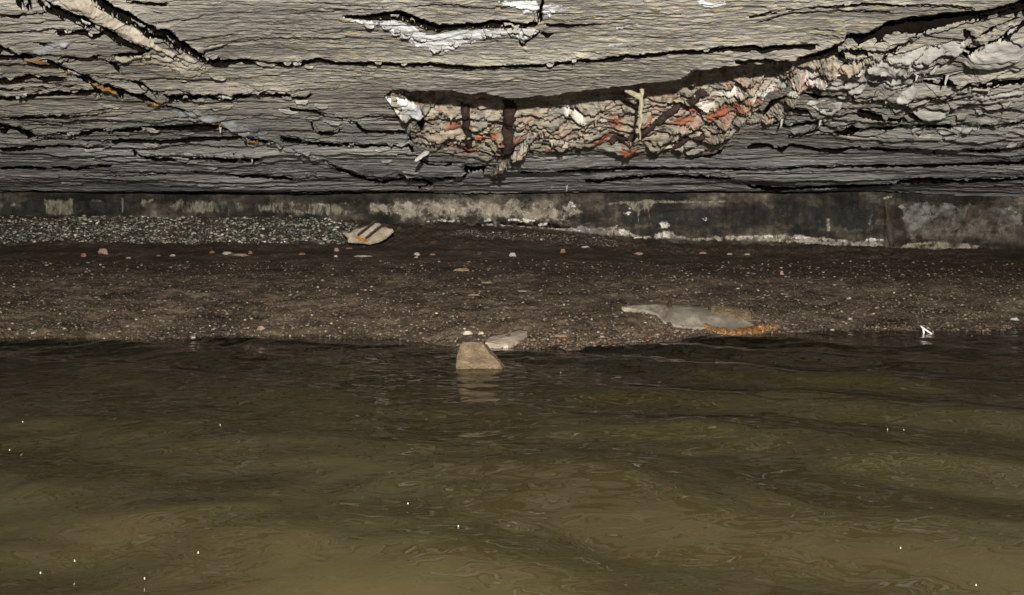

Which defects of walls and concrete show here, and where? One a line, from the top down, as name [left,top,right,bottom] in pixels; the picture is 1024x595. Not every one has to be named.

peeling [350,0,569,54]
crack [0,0,1024,248]
spalling [373,40,1013,185]
damp [2,198,153,218]
damp [172,200,242,214]
damp [257,202,356,216]
damp [369,196,1023,249]